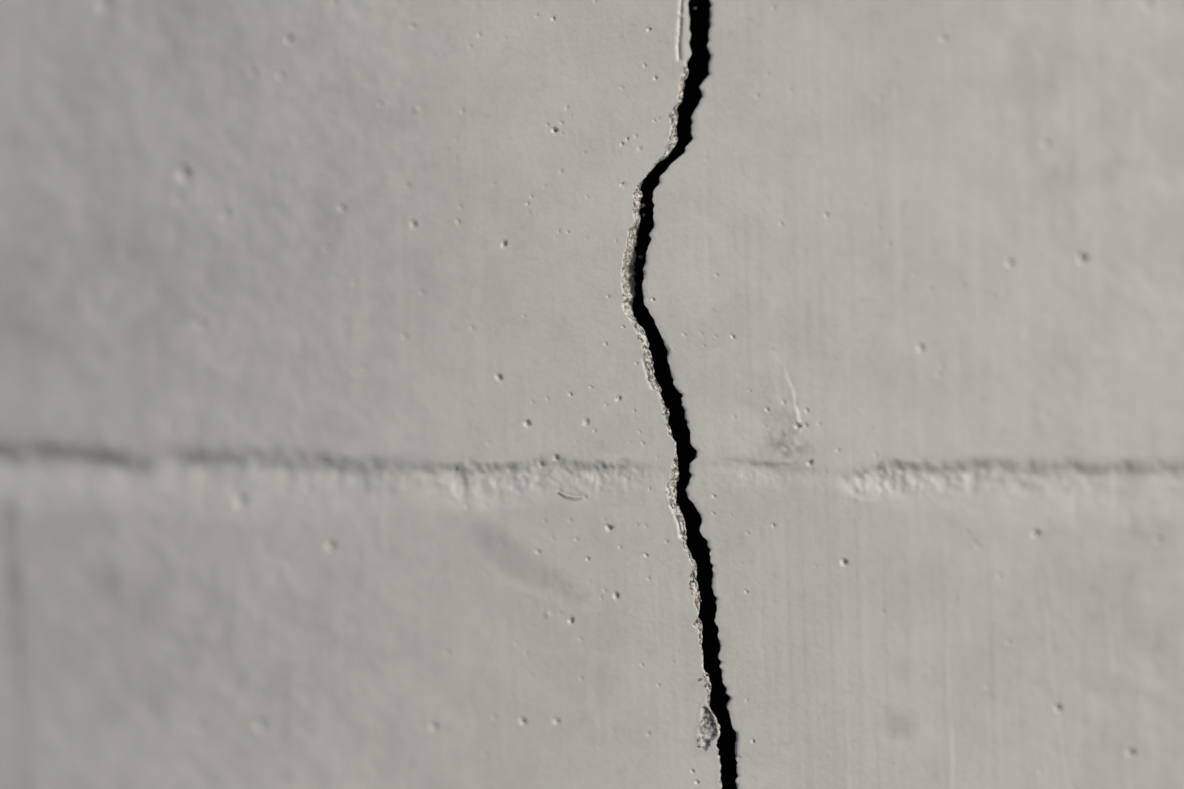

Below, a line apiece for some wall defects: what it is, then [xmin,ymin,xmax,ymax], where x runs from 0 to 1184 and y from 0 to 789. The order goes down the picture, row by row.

crack [621,0,743,789]